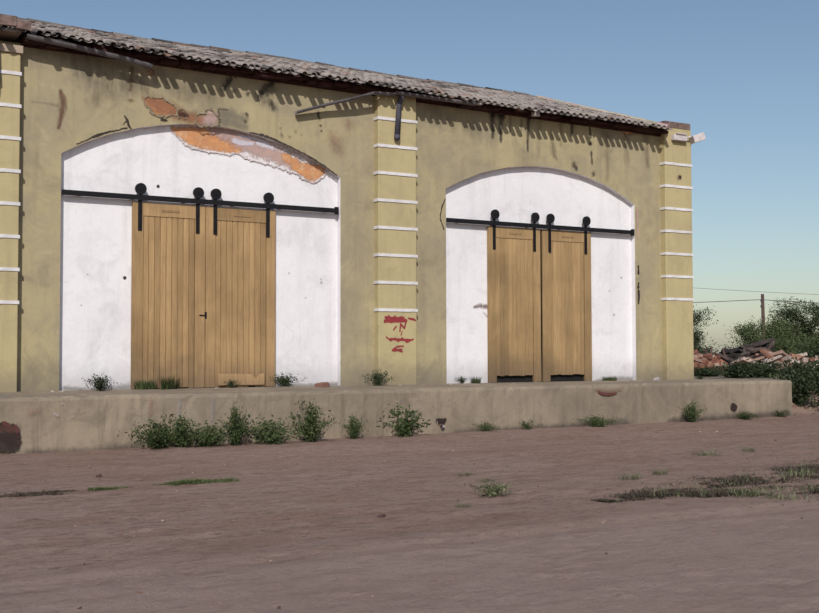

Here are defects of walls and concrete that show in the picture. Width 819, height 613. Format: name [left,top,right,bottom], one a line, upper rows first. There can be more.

crack [76,115,132,145]
flaking render [144,95,327,184]
leakage [490,113,503,140]